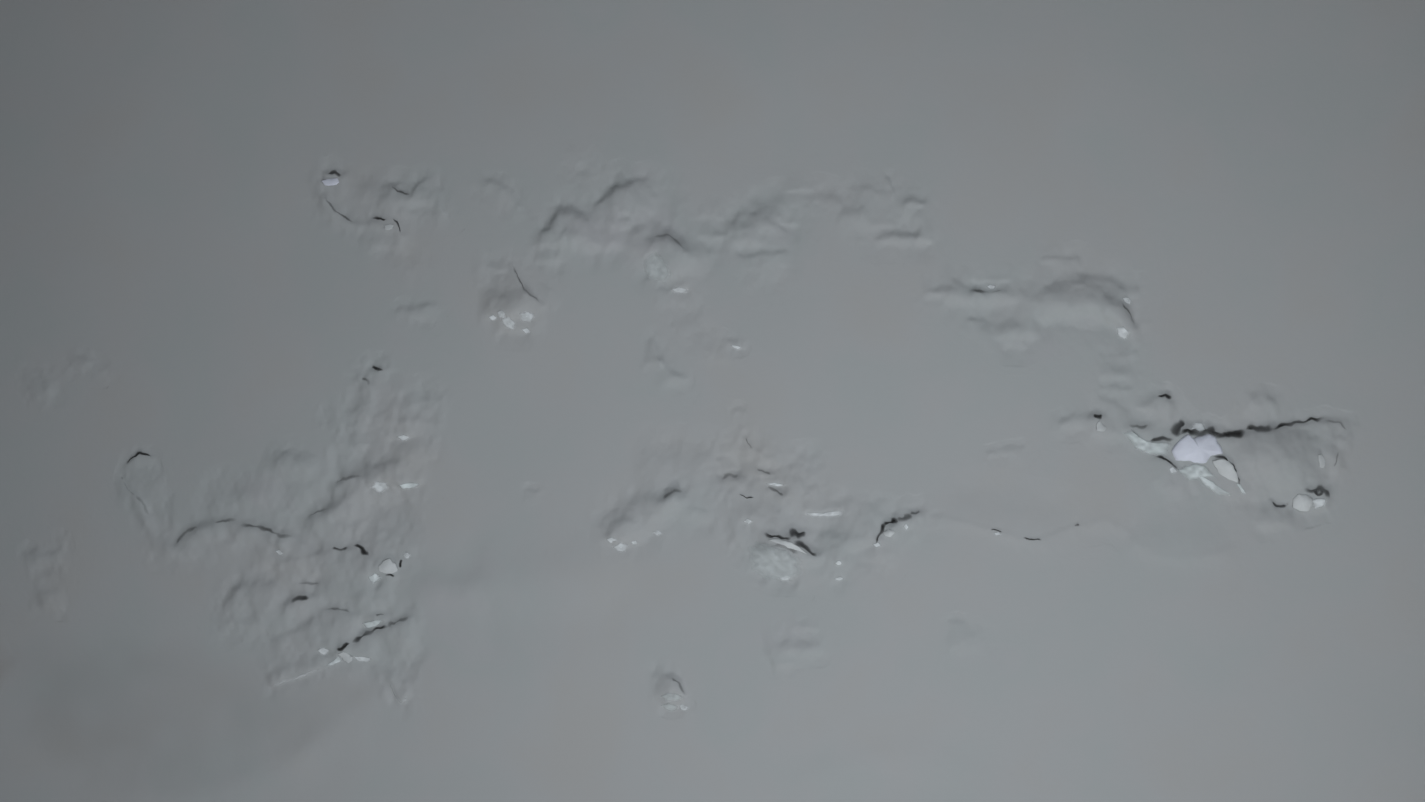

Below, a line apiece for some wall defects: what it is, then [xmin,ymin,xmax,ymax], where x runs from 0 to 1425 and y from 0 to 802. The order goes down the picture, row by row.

spalling [1039,373,1372,539]